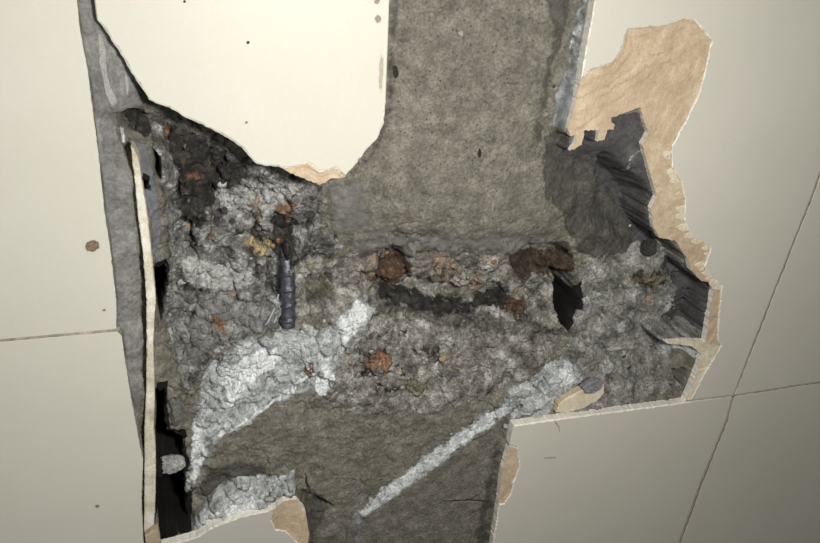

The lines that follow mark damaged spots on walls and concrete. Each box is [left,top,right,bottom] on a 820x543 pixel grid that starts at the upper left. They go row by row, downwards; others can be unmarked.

rust [361,250,407,289]
spalling [98,0,723,543]